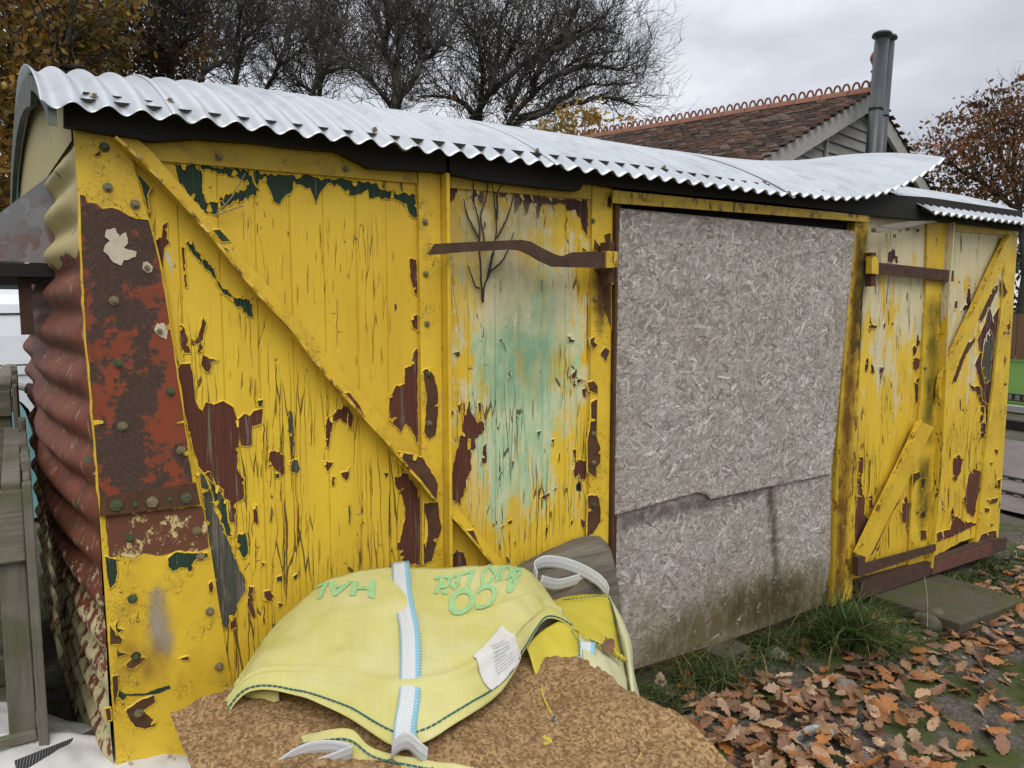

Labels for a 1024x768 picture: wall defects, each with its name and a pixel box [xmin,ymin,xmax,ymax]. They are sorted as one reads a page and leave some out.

peeling [172,163,418,253]
peeling [450,188,589,252]
corrosion [78,194,209,559]
peeling [166,316,302,632]
peeling [383,471,421,566]
peeling [387,347,420,446]
peeling [452,397,488,506]
water stain [768,488,776,552]
corrosion [836,247,861,590]
peeling [853,456,873,547]
peeling [936,448,999,543]
peeling [968,305,1000,439]